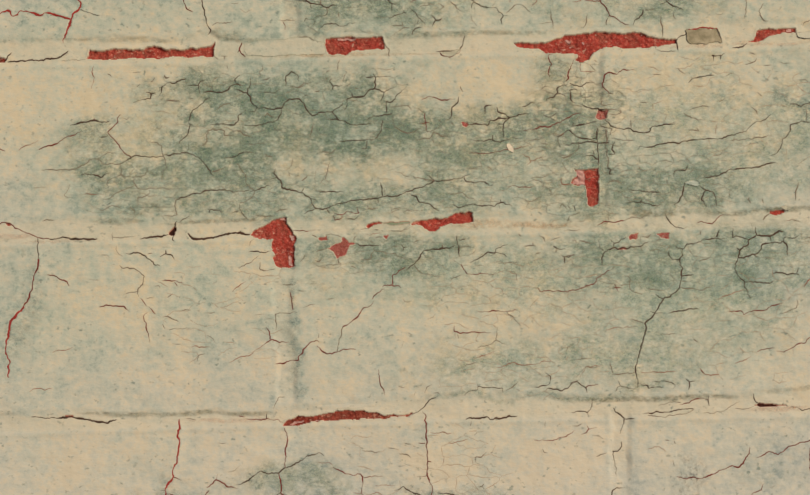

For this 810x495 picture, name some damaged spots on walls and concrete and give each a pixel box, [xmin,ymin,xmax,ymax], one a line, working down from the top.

crack [0,0,111,87]
peeling [88,44,215,60]
peeling [244,37,384,57]
peeling [516,32,676,62]
crack [659,27,769,96]
peeling [251,218,296,268]
peeling [367,212,473,231]
crack [0,222,96,378]
crack [107,250,215,362]
crack [33,416,117,424]
peeling [284,410,412,426]
crack [162,418,194,495]